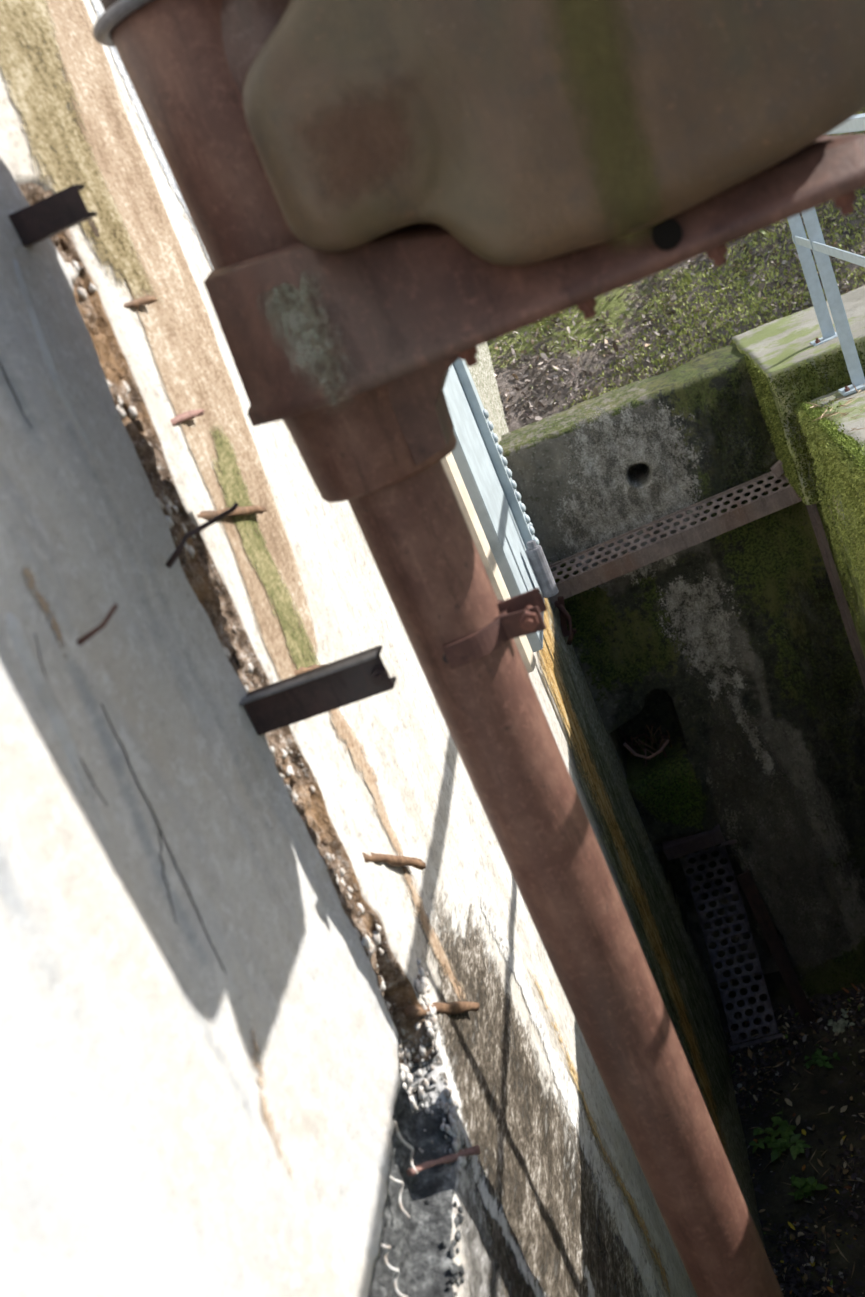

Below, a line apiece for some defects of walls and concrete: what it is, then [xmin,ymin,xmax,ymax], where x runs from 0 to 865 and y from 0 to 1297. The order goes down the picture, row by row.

rust [46,0,317,680]
damp [551,369,789,575]
crack [101,703,227,974]
rust [330,708,466,1000]
damp [591,552,865,980]
damp [402,884,664,1297]